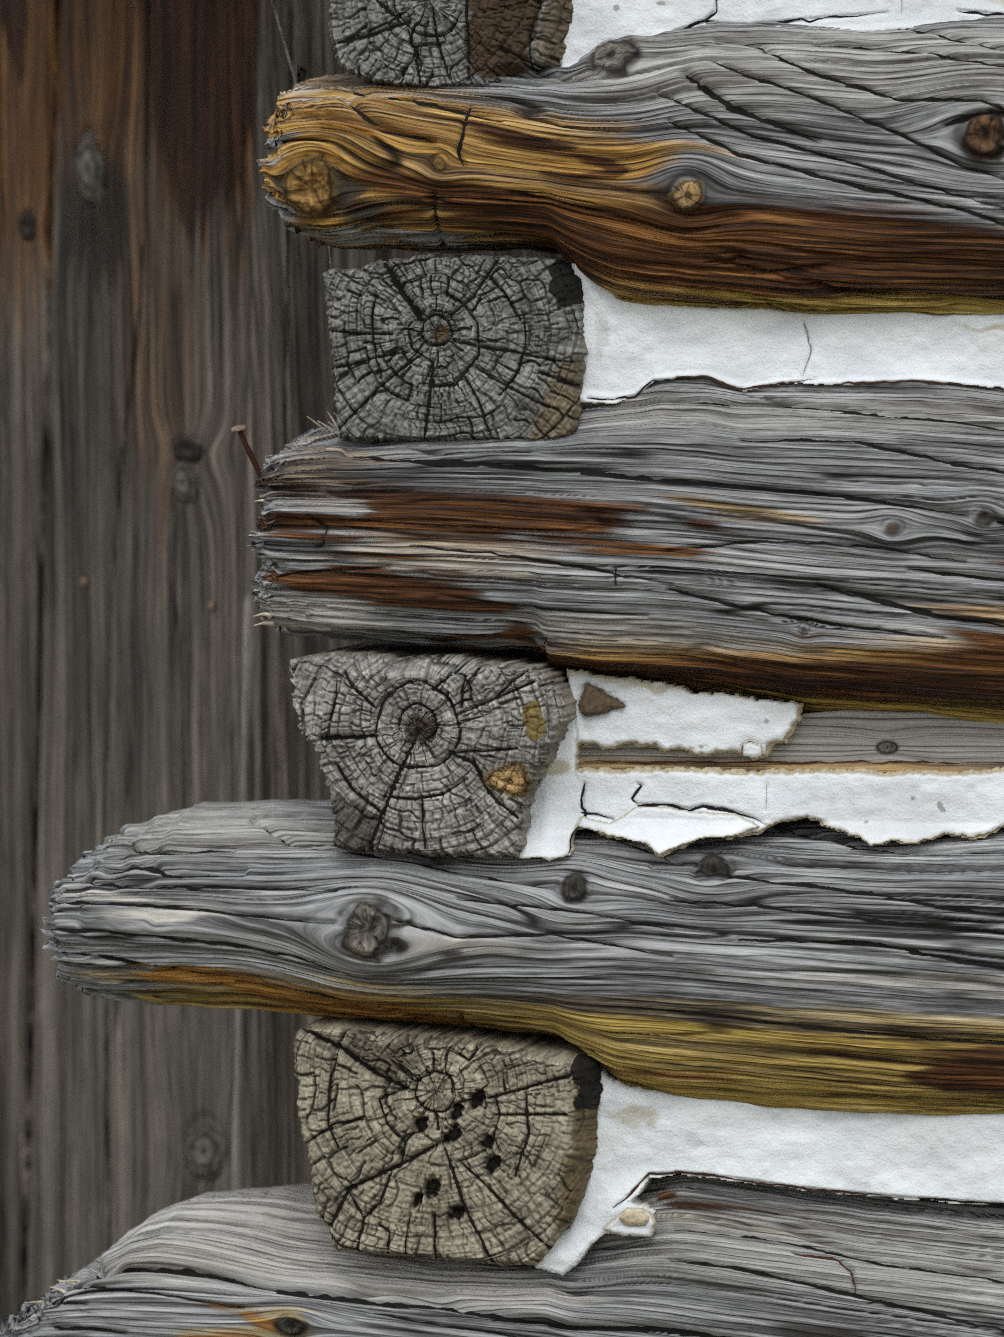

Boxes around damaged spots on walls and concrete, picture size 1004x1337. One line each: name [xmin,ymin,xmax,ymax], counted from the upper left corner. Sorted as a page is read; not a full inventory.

crack [683,0,717,29]
crack [777,0,902,23]
flaking render [576,691,1004,775]
crack [567,741,1004,855]
flaking render [577,807,1004,857]
crack [612,1171,1004,1208]